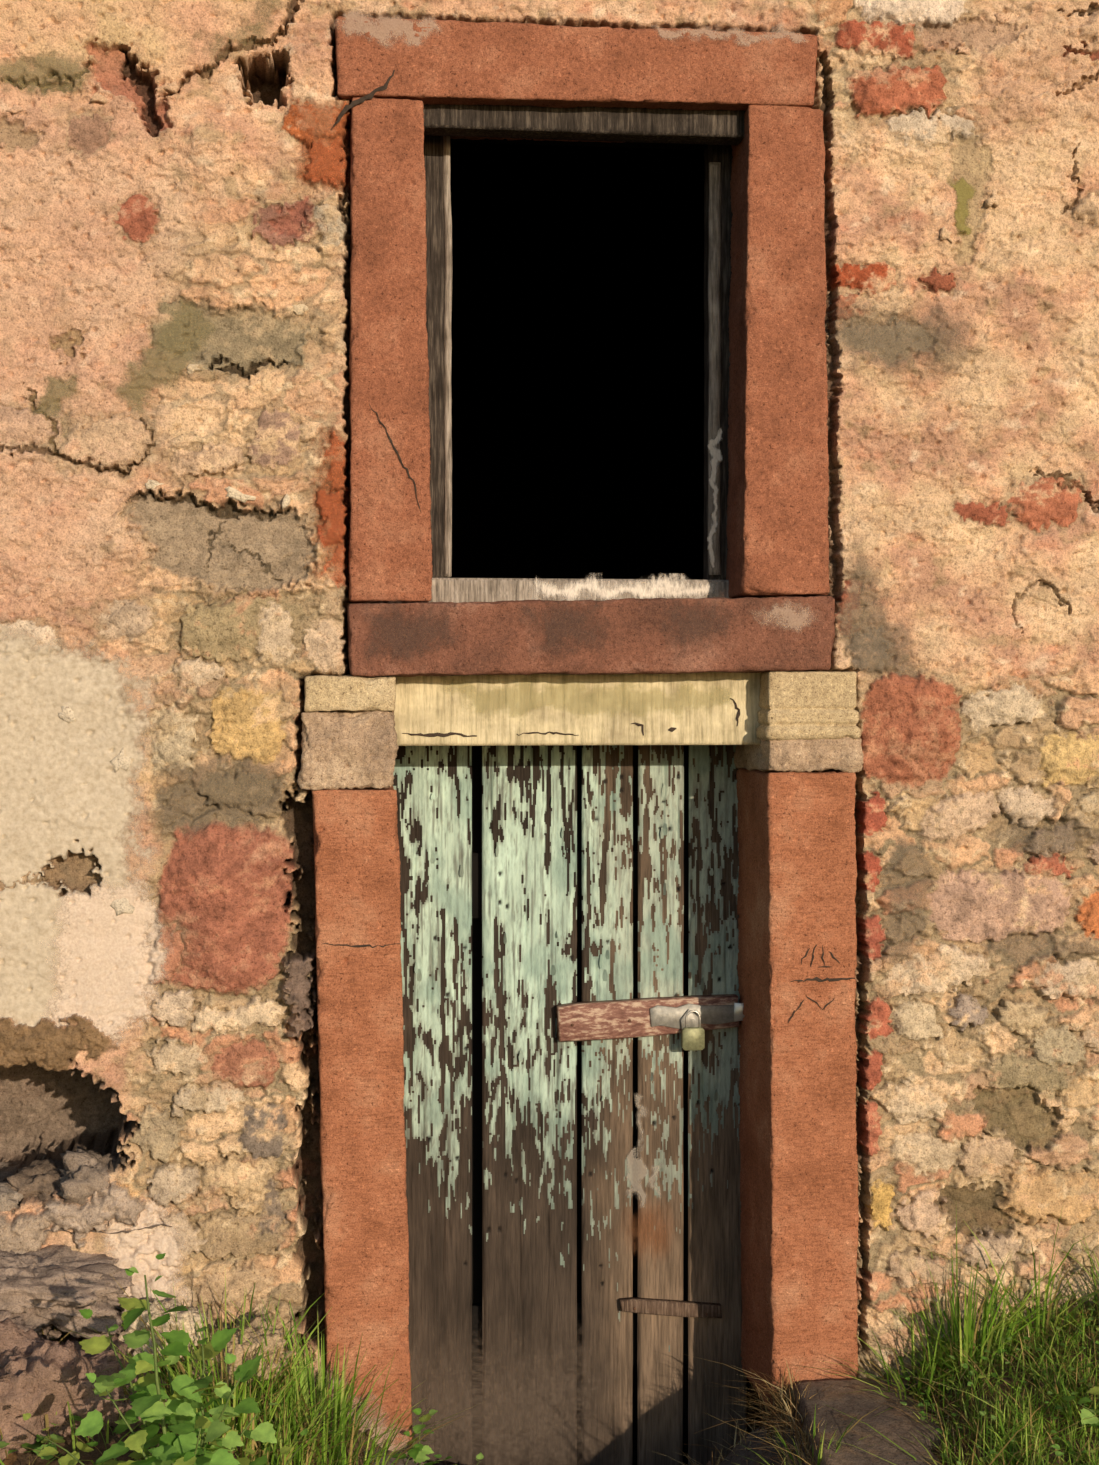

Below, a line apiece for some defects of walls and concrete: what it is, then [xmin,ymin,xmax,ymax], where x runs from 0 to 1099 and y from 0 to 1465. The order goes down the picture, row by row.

crack [159,0,305,97]
crack [1056,2,1099,96]
crack [0,382,156,477]
crack [1029,466,1099,513]
spalling [0,1013,173,1255]